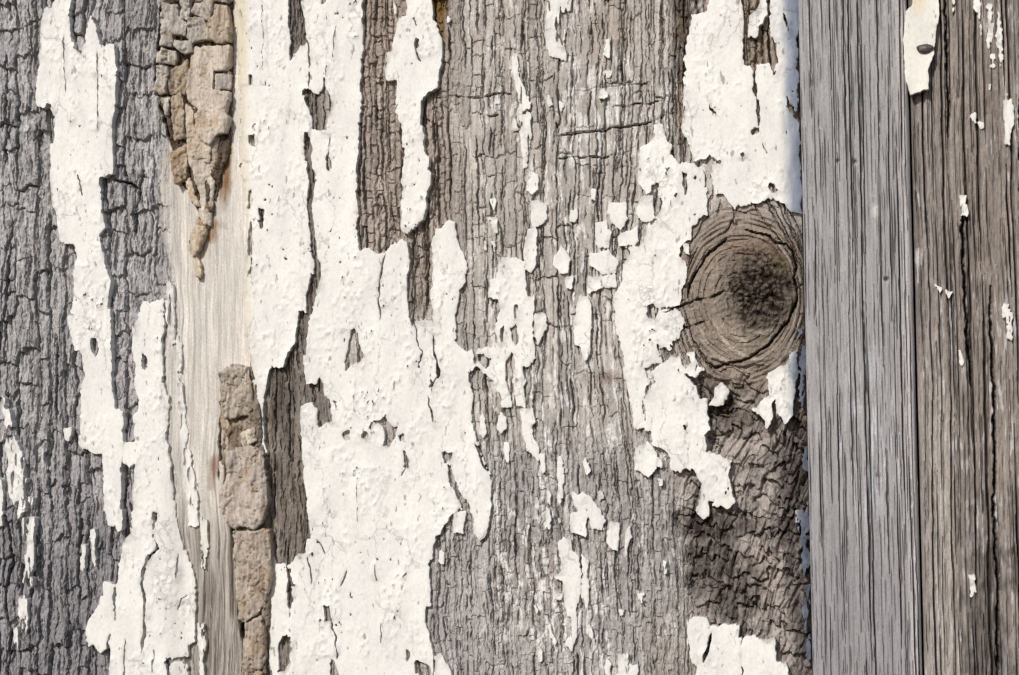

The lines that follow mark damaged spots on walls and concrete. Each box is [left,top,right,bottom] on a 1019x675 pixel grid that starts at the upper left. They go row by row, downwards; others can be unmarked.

peeling [903,0,939,96]
peeling [973,0,1004,68]
peeling [1003,93,1014,146]
peeling [35,0,210,675]
peeling [153,0,633,675]
peeling [553,0,806,519]
crack [714,234,798,369]
peeling [959,195,969,218]
peeling [0,395,39,649]
peeling [604,652,639,675]
peeling [687,615,790,675]
peeling [795,509,812,661]